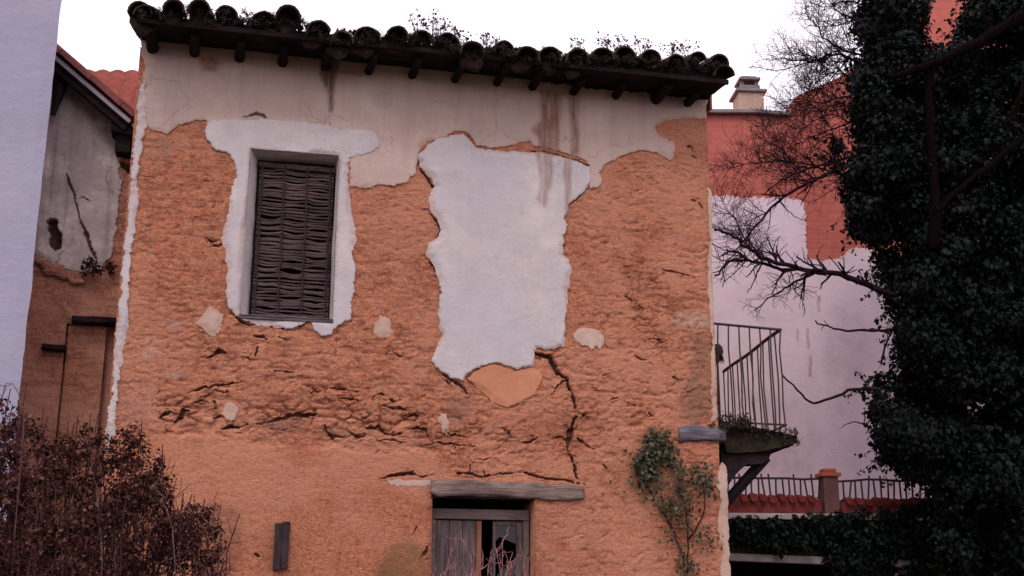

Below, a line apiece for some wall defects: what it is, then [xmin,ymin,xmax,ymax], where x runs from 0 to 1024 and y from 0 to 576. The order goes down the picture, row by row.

crack [63,171,102,270]
crack [203,344,230,360]
flaking render [34,38,708,457]
crack [384,347,405,360]
crack [378,349,599,488]
flaking render [689,188,718,421]